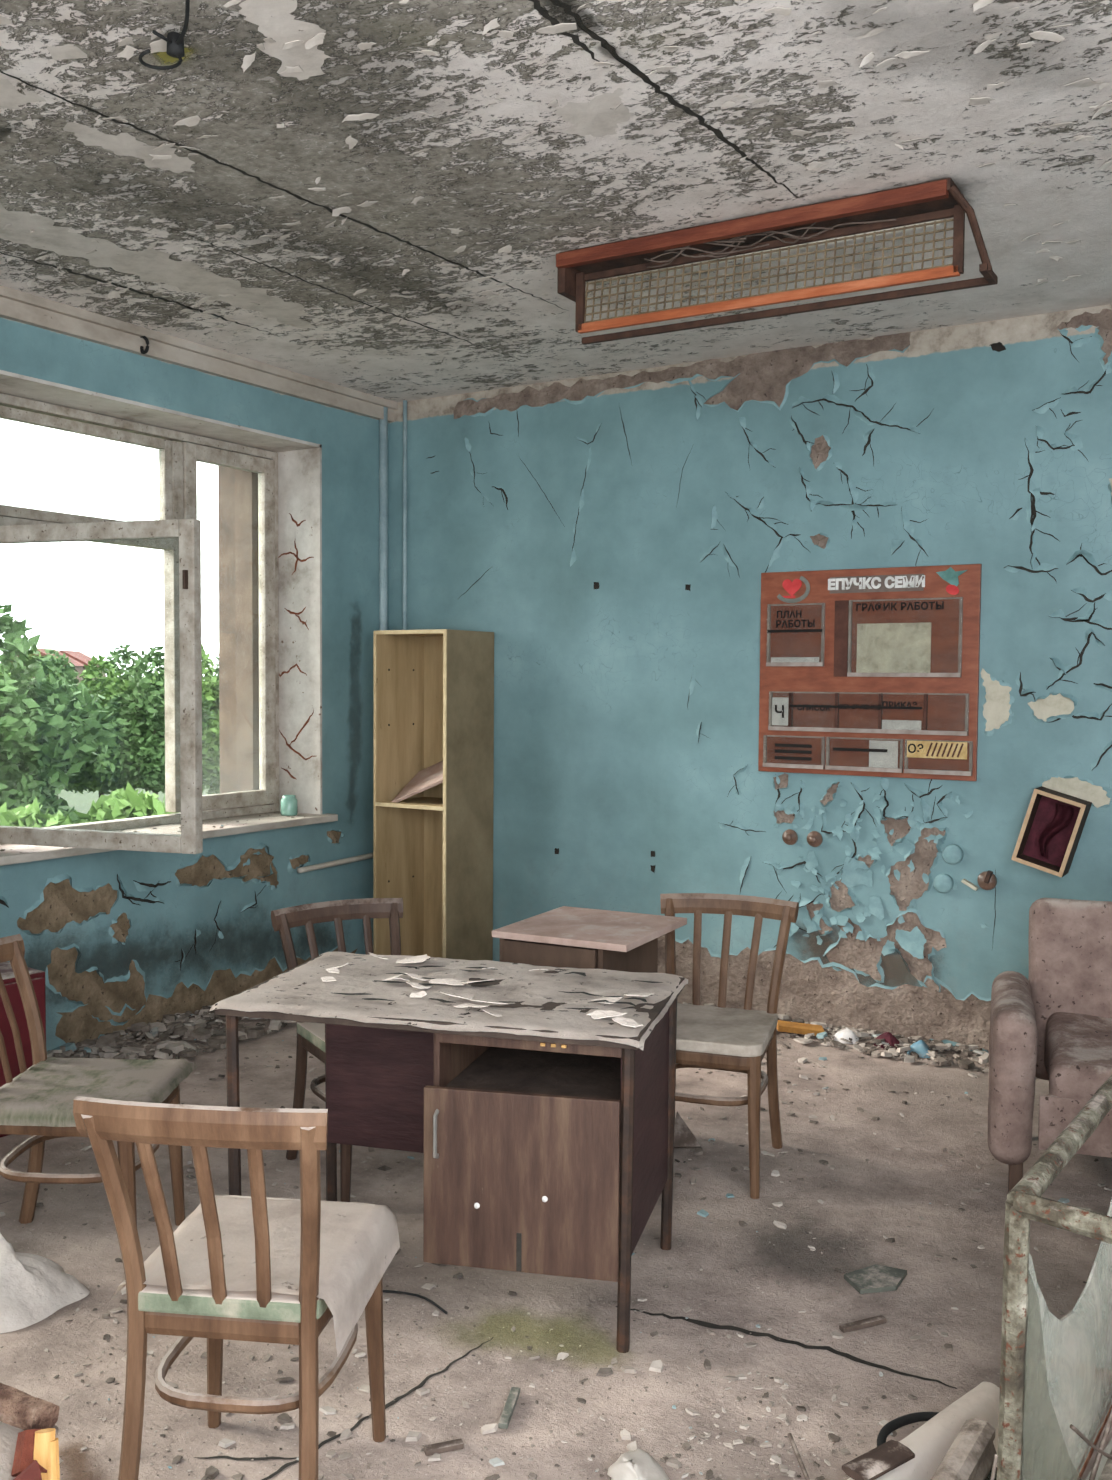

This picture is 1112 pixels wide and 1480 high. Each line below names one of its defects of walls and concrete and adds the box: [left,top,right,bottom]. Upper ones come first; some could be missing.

peeling [117,29,167,59]
peeling [223,0,331,81]
peeling [0,79,215,173]
crack [529,0,798,198]
peeling [0,200,350,374]
crack [1004,330,1112,771]
peeling [981,669,1079,736]
peeling [1042,774,1112,809]
peeling [17,873,358,1044]
peeling [174,843,310,891]
peeling [657,772,991,1052]
crack [615,1306,957,1389]